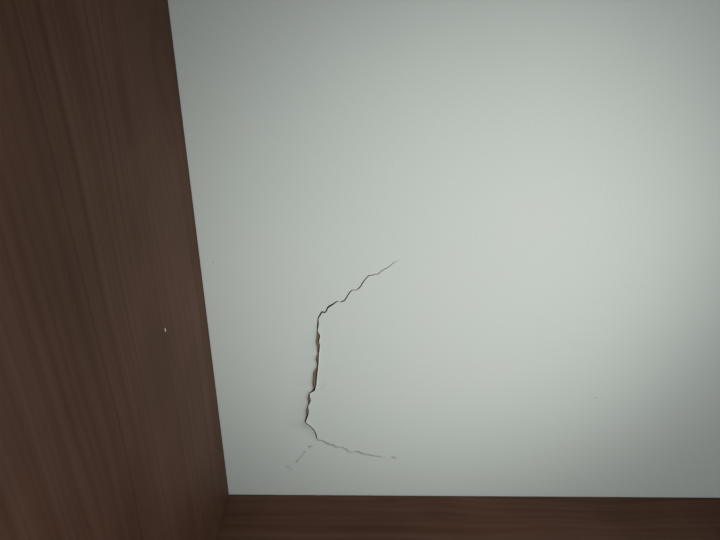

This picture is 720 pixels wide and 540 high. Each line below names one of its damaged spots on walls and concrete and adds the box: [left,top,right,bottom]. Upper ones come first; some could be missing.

crack [279,260,399,440]